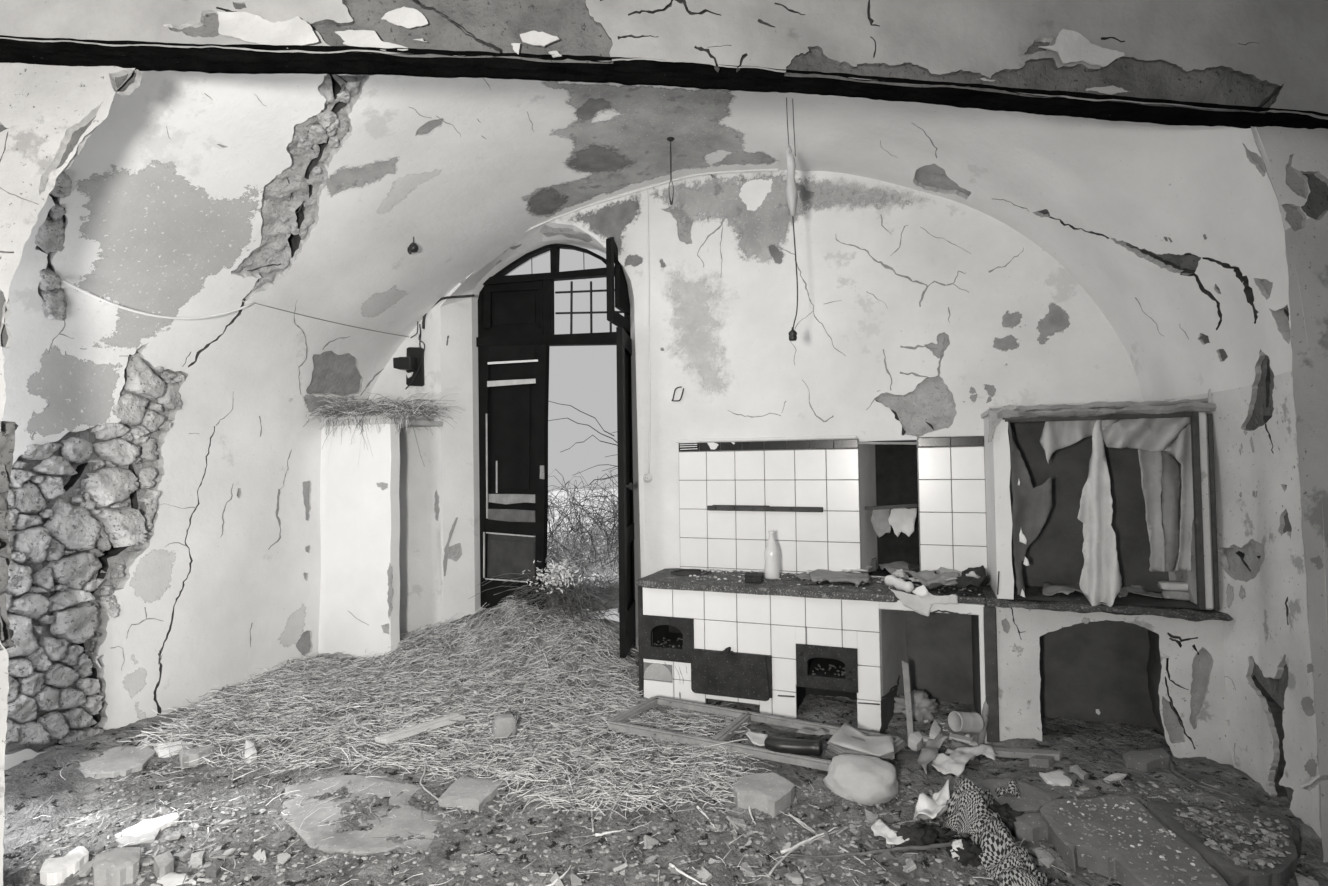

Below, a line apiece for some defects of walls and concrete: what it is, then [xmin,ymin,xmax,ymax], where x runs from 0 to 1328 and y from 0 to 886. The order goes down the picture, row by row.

crack [600,0,747,72]
crack [867,0,880,58]
spalling [784,29,1283,113]
crack [997,199,1109,239]
spalling [1242,143,1328,231]
crack [728,214,1024,422]
crack [1135,257,1258,339]
flaking render [0,69,371,755]
spalling [874,375,1018,442]
spalling [1241,349,1274,431]
crack [111,399,262,715]
spalling [1246,654,1328,805]